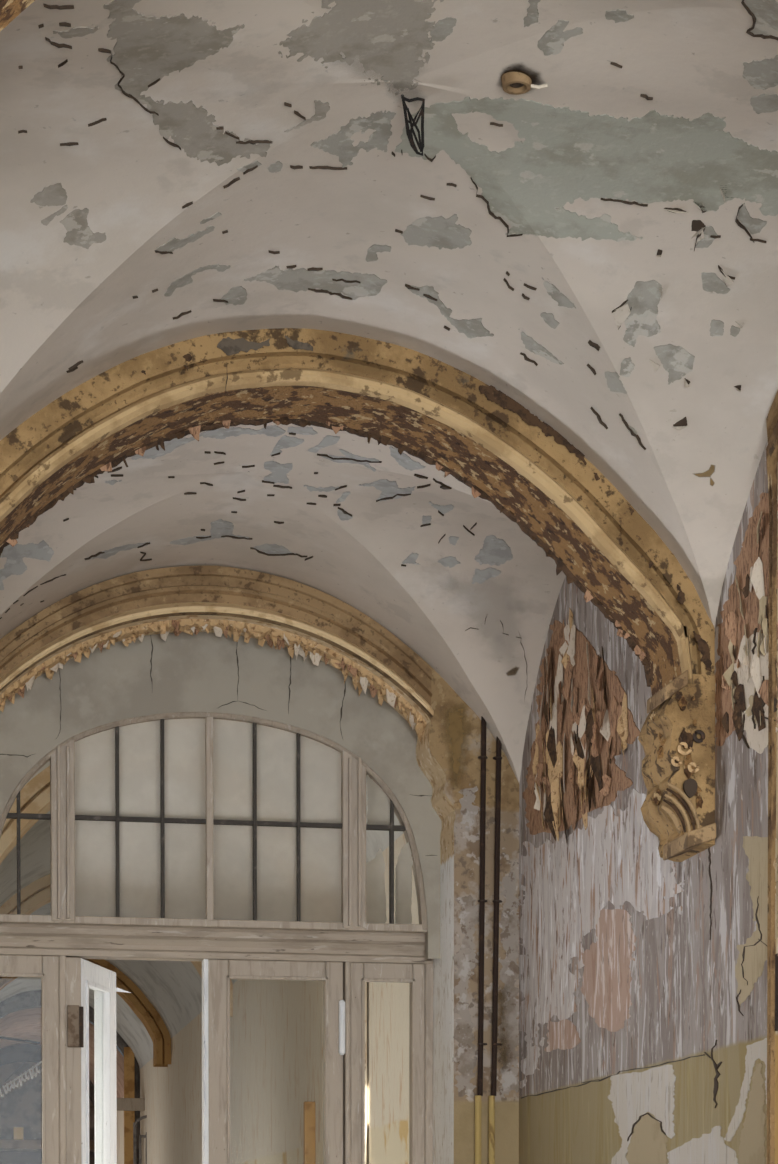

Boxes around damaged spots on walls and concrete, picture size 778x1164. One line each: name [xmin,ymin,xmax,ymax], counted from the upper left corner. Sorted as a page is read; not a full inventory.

peeling [30,0,778,254]
peeling [213,244,391,305]
peeling [405,284,494,338]
peeling [503,271,576,329]
peeling [587,280,695,394]
flaking render [479,385,600,481]
peeling [0,413,652,687]
flaking render [0,619,427,741]
peeling [497,608,685,1098]
peeling [735,836,778,1006]
flaking render [453,895,479,1098]
peeling [607,1038,767,1164]